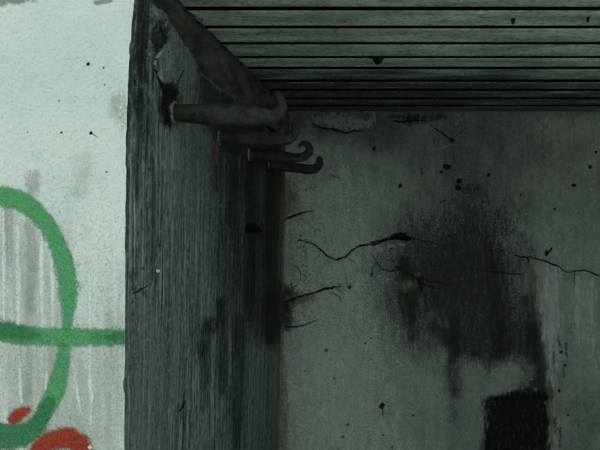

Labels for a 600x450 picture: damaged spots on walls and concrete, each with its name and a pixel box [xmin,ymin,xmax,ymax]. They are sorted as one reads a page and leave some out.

crack [284,210,315,221]
crack [283,235,453,328]
crack [474,255,600,287]